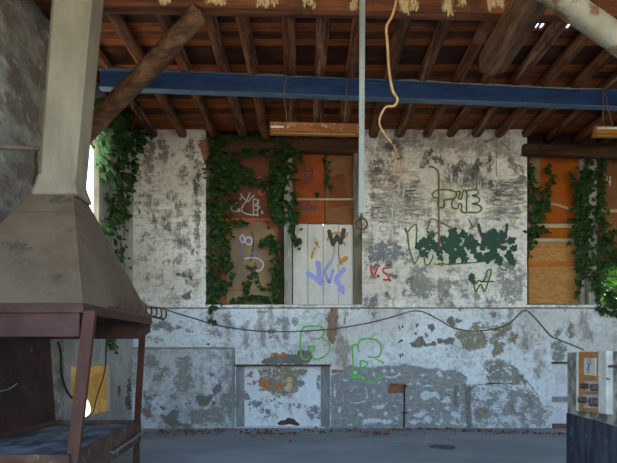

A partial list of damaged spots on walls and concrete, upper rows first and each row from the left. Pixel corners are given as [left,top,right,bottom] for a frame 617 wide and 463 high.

flaking render [277,418,300,426]